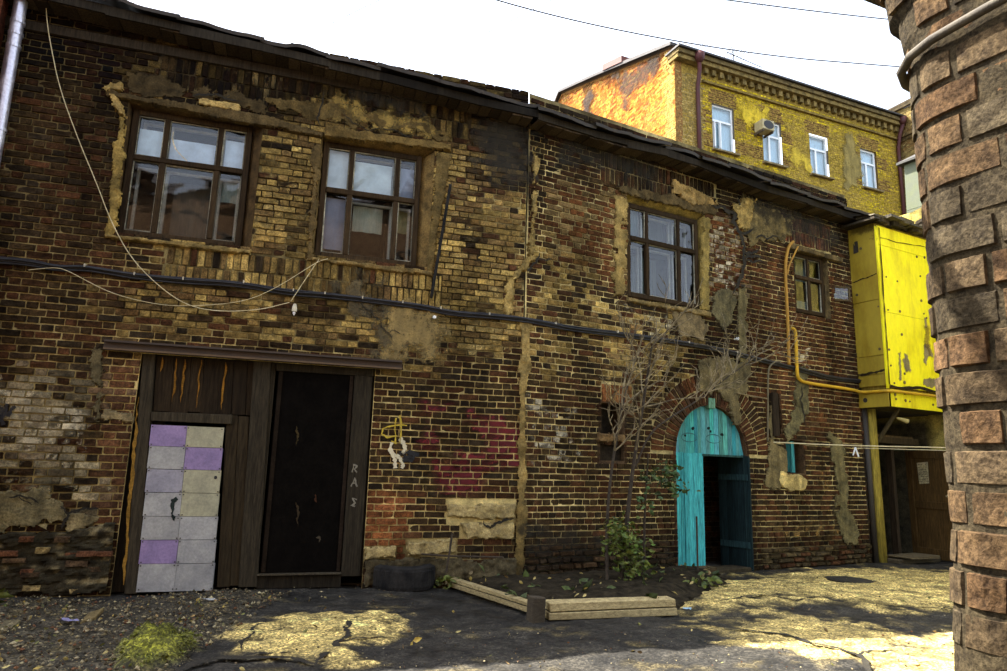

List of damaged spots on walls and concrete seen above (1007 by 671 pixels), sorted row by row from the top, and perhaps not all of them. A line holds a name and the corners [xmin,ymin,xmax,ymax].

spalling [103,81,128,119]
spalling [198,98,241,111]
spalling [670,179,719,205]
peeling [731,192,794,247]
peeling [898,352,911,380]
peeling [779,471,807,492]
spalling [0,487,115,596]